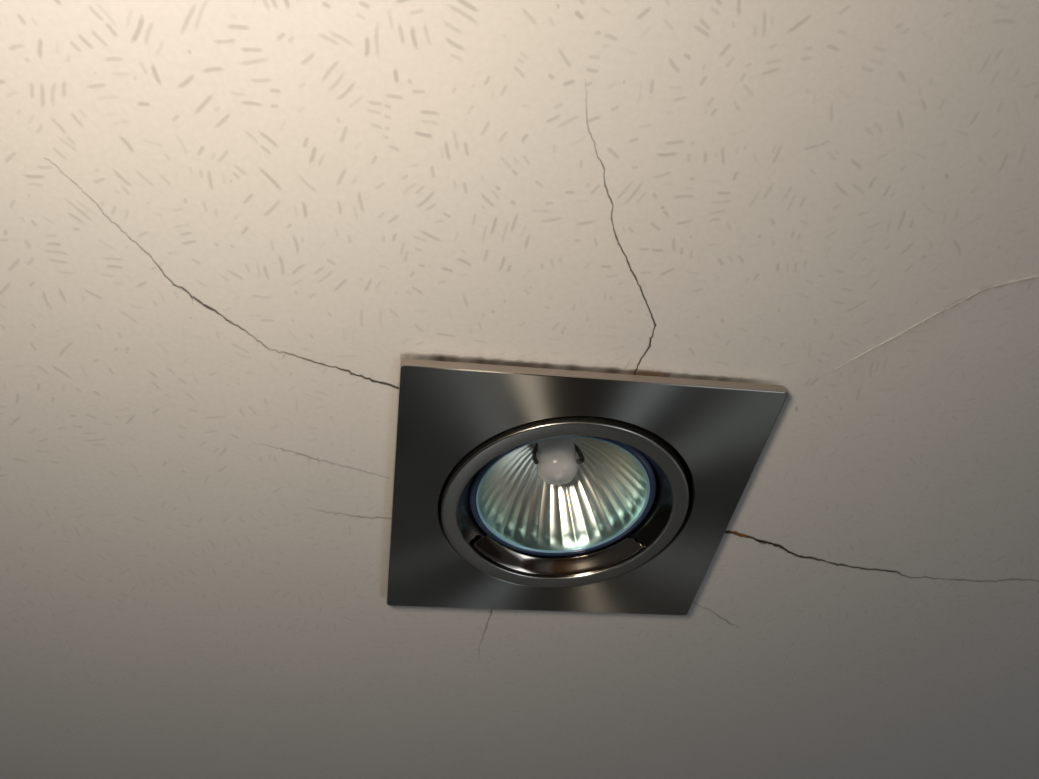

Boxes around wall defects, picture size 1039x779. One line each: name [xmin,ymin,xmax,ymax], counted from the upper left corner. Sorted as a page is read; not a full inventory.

crack [158,266,248,333]
crack [601,162,656,371]
crack [306,359,399,389]
crack [725,531,904,576]